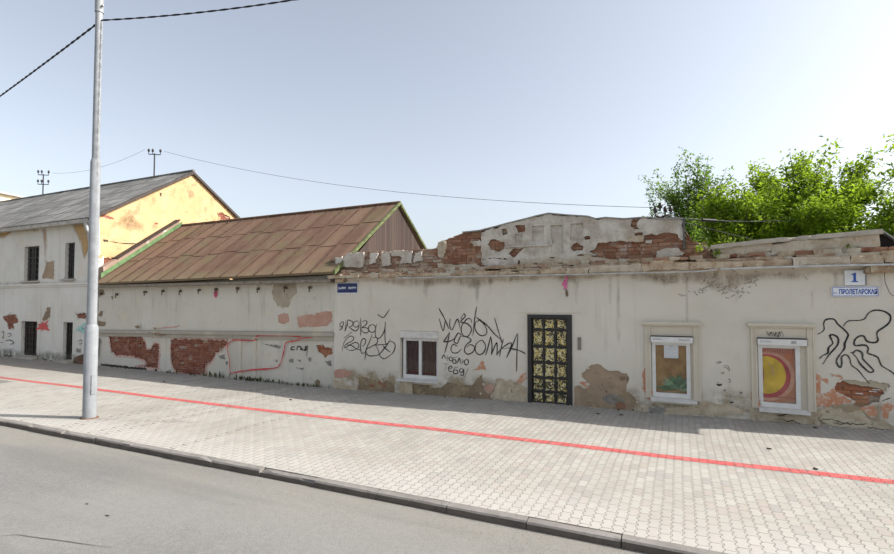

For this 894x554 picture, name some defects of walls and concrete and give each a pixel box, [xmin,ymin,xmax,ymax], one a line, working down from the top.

spalling [863,266,894,274]
flaking render [3,313,18,330]
peeling [272,284,332,328]
flaking render [98,326,228,375]
flaking render [413,361,495,399]
flaking render [574,364,894,430]